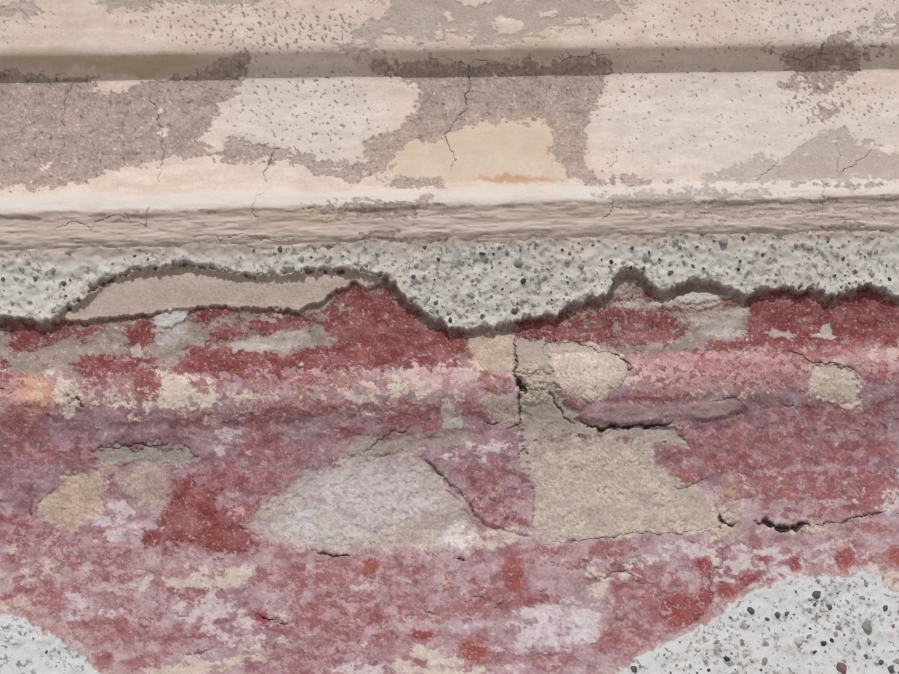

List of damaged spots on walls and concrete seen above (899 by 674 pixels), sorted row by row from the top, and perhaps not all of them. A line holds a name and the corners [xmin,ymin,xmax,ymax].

peeling [0,0,899,241]
spalling [0,260,899,674]
crack [511,343,527,428]
crack [550,389,673,431]